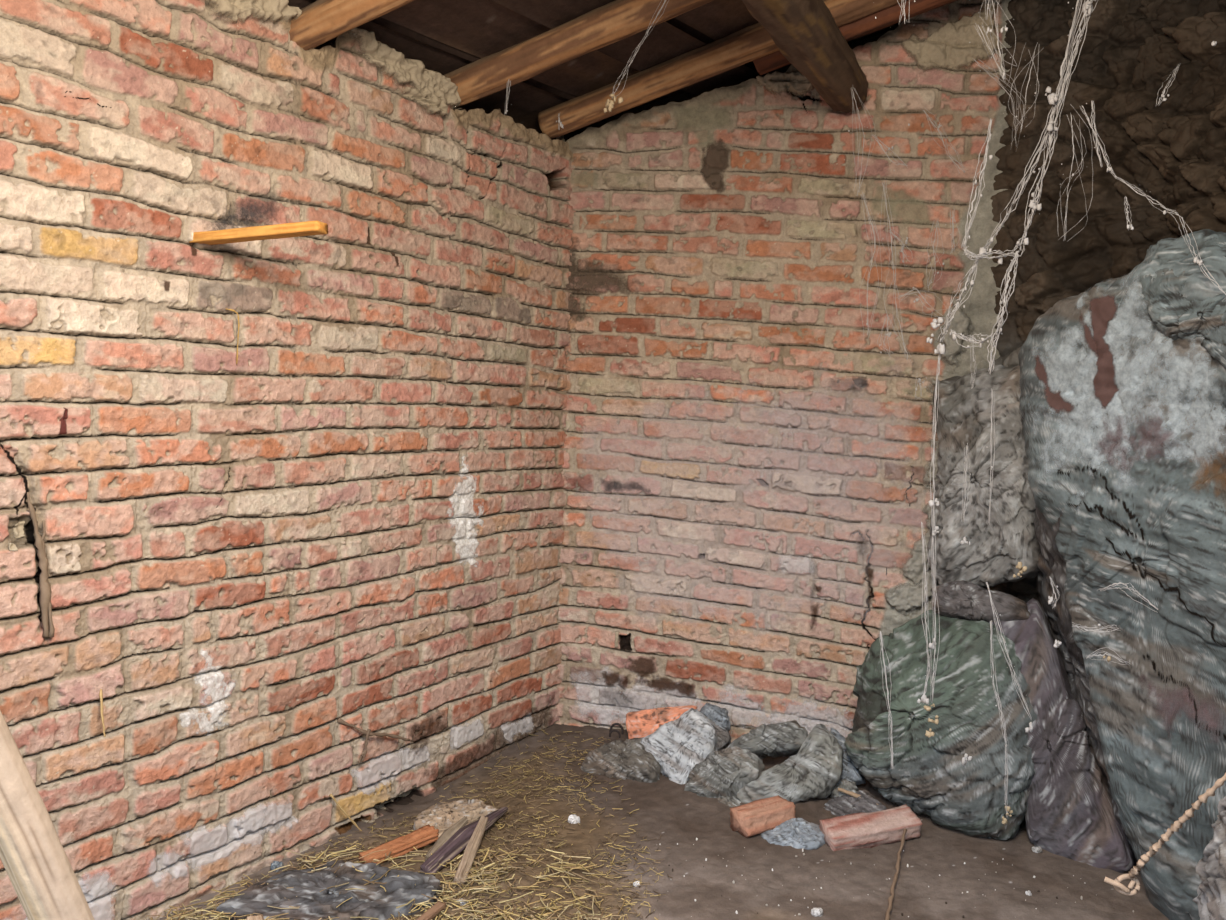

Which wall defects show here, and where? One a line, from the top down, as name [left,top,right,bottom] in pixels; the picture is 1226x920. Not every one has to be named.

crack [0,444,42,622]
damp [447,456,483,567]
crack [853,530,887,650]
damp [180,651,236,735]
damp [576,657,700,725]
damp [716,686,851,734]